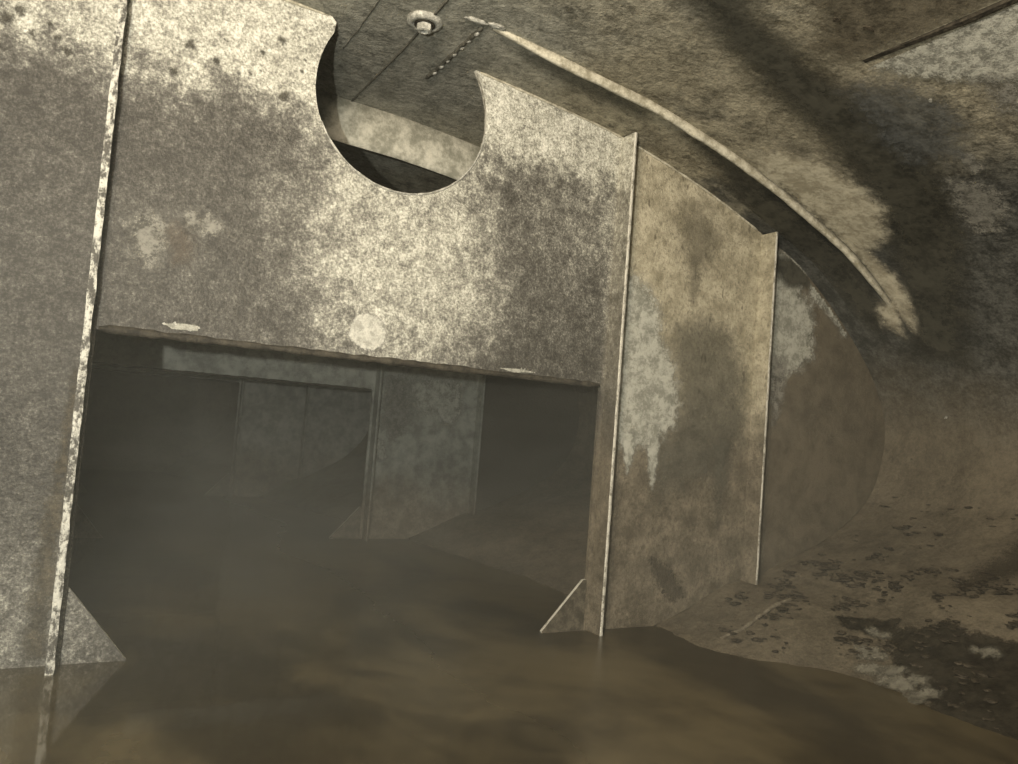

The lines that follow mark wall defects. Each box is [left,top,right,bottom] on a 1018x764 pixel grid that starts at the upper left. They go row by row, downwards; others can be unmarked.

leakage [534,59,642,115]
leakage [689,0,1018,425]
leakage [616,275,740,503]
leakage [835,616,1018,740]